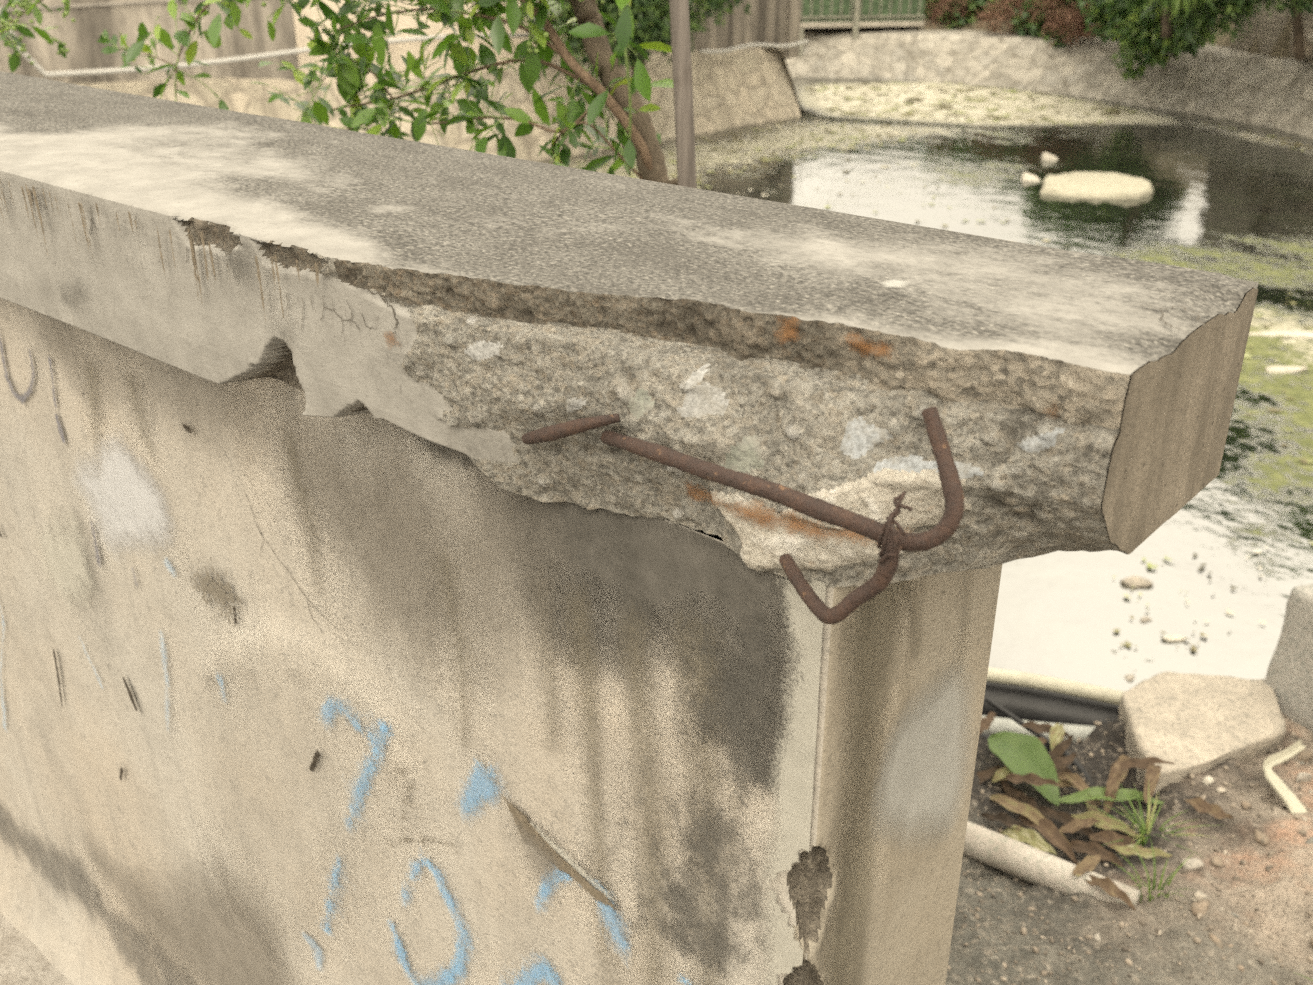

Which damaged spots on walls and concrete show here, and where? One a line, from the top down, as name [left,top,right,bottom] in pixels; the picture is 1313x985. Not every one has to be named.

peeling [178,217,338,279]
spalling [370,289,1128,587]
rust [737,507,822,534]
water stain [288,439,804,804]
water stain [635,798,769,976]
peeling [783,846,833,985]